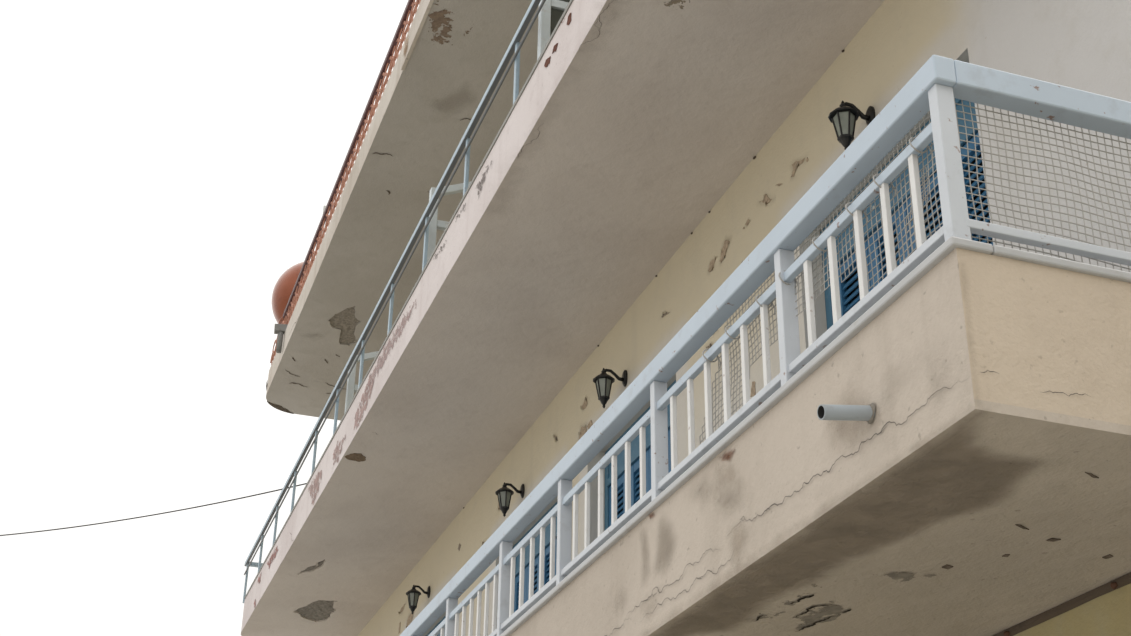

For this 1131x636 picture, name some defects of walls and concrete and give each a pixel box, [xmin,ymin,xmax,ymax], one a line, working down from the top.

peeling [428,1,473,45]
peeling [308,300,416,505]
crack [605,370,999,636]
spalling [294,600,336,621]
flaking render [759,584,847,630]